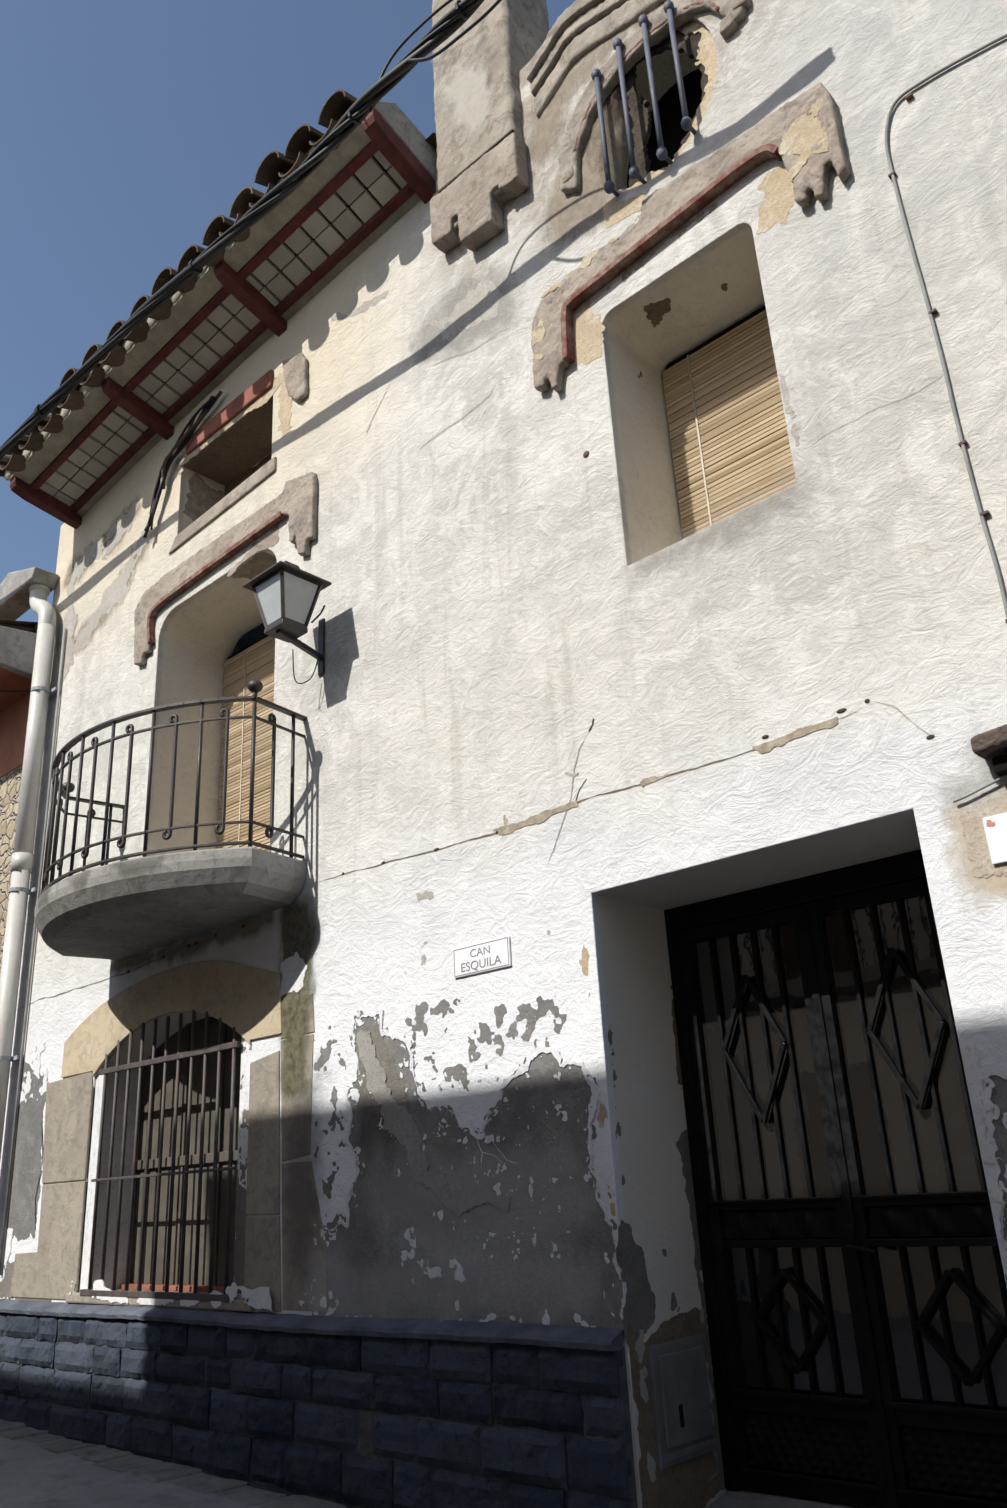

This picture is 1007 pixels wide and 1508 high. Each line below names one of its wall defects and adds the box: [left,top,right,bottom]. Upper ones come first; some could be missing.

peeling [756,98,829,235]
peeling [568,203,718,368]
crack [307,699,934,886]
damp [110,901,316,1096]
spalling [579,945,590,996]
peeling [0,1042,52,1302]
peeling [85,1079,100,1239]
peeling [299,996,680,1403]
peeling [959,1035,1007,1280]
flaking render [676,1130,725,1491]